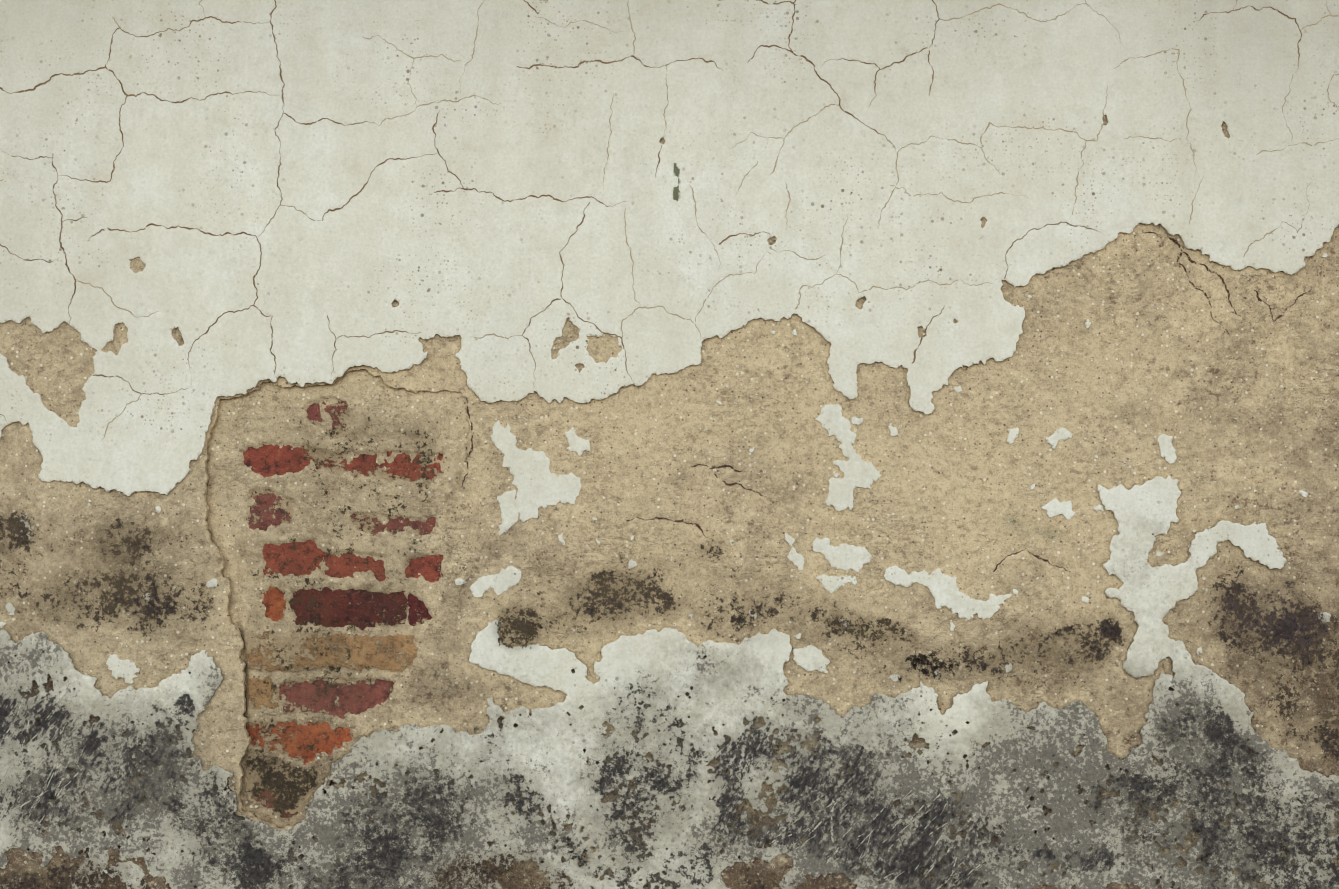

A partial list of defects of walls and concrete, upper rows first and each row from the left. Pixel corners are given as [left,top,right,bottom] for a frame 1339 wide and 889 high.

crack [1198,0,1338,155]
crack [0,0,1311,439]
water stain [0,509,218,641]
water stain [242,417,437,818]
flaking render [0,223,1339,830]
water stain [495,540,1125,686]
water stain [0,678,1339,889]
flaking render [721,853,857,889]